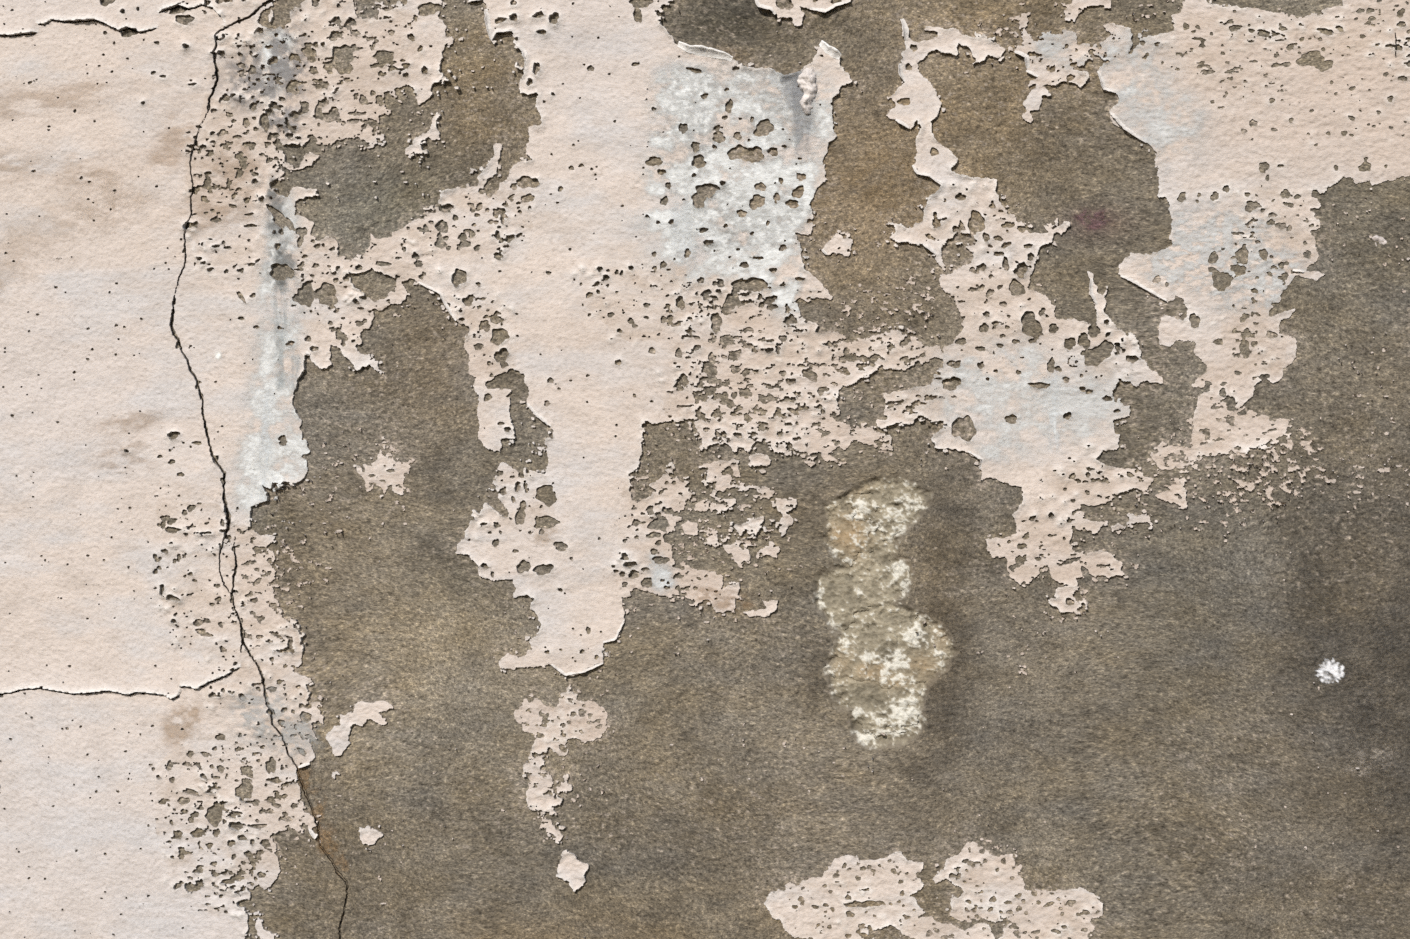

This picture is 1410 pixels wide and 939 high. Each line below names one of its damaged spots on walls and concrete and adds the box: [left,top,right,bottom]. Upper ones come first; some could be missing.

crack [0,0,348,939]
peeling [359,825,384,845]
peeling [253,0,1410,816]
peeling [764,838,1104,939]